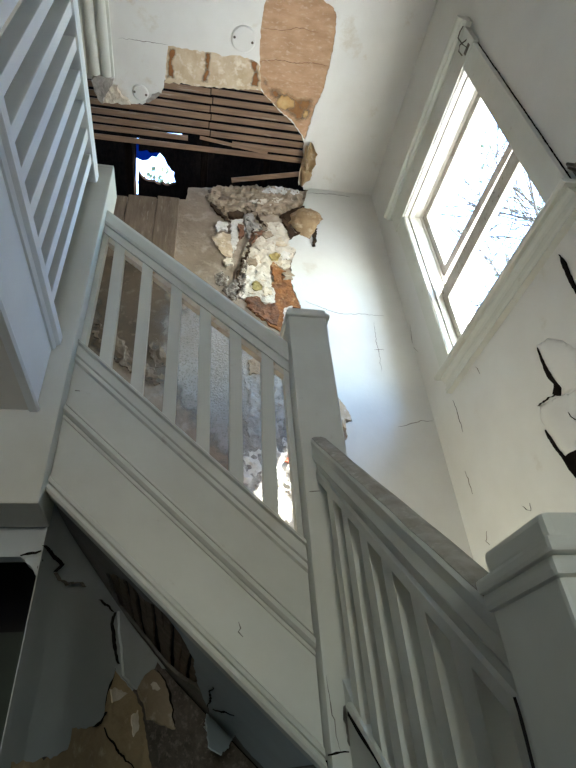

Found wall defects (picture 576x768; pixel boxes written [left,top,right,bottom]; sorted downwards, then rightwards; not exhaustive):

spalling [91,74,131,105]
peeling [164,0,337,304]
crack [42,545,120,664]
peeling [11,611,175,768]
crack [207,688,234,716]